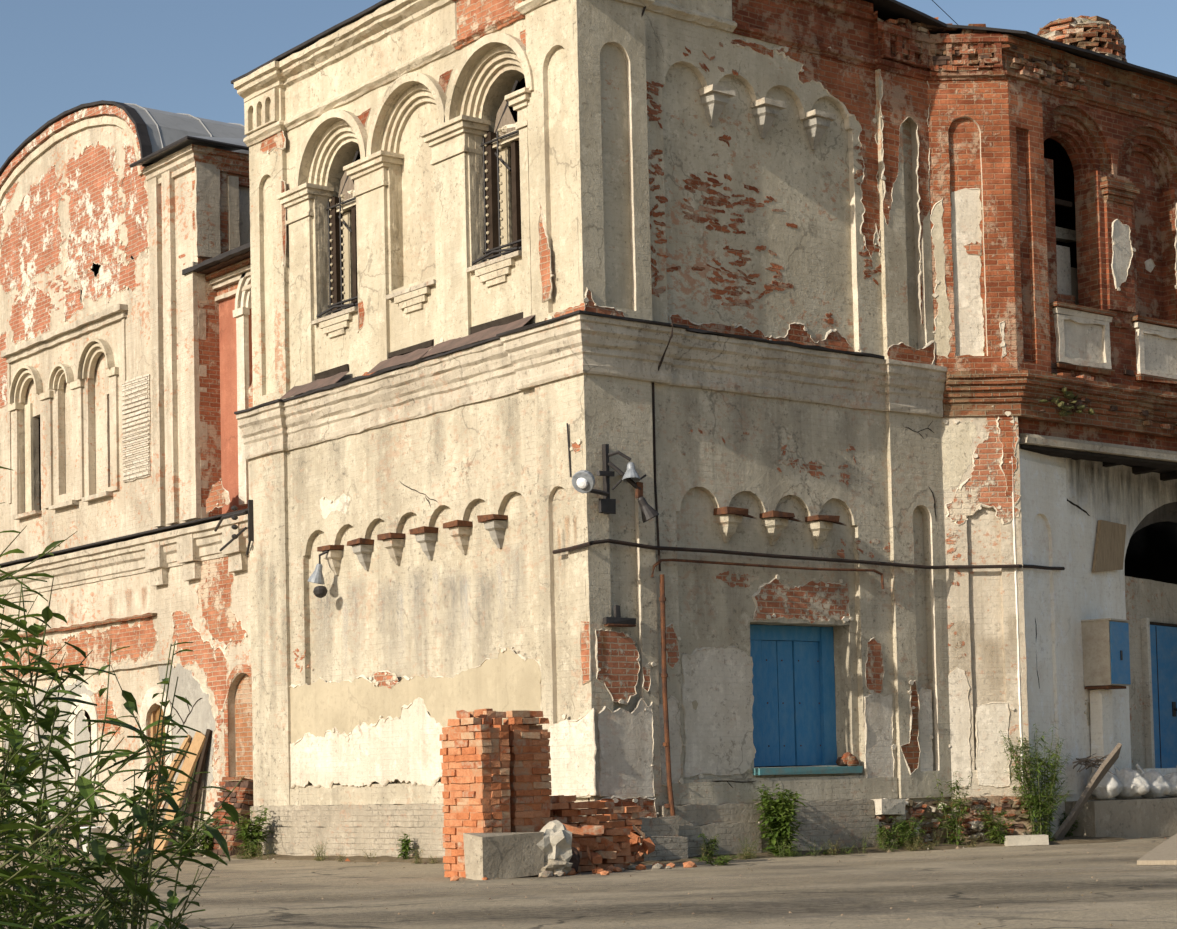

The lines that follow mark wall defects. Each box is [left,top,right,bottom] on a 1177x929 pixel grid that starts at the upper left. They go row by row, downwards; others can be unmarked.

spalling [646,81,664,129]
flaking render [0,140,162,409]
flaking render [538,204,625,321]
spalling [648,149,798,310]
flaking render [669,17,1111,365]
spalling [1111,219,1155,291]
flaking render [941,406,1021,586]
flaking render [716,571,854,624]
flaking render [0,556,248,820]
peeling [290,621,756,826]
peeling [864,637,921,792]
peeling [947,623,1015,789]